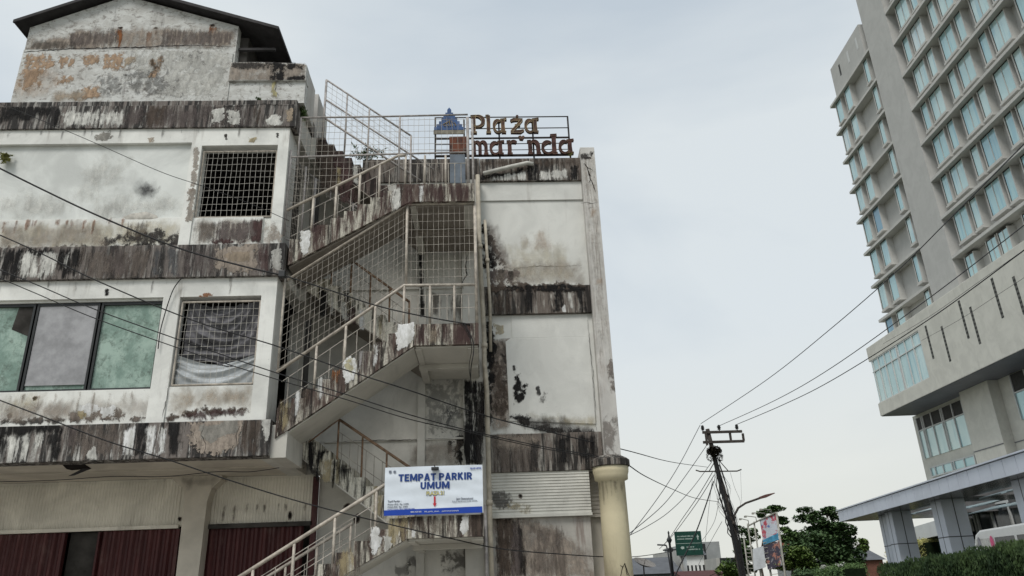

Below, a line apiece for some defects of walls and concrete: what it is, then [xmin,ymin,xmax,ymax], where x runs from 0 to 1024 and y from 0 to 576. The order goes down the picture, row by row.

damp [0,106,60,125]
peeling [17,48,230,127]
spalling [211,107,241,140]
damp [0,219,282,280]
peeling [342,346,378,384]
peeling [395,322,415,351]
damp [444,224,597,469]
damp [0,393,149,462]
damp [166,377,322,457]
damp [302,442,347,488]
peeling [369,526,392,555]
damp [492,491,594,576]